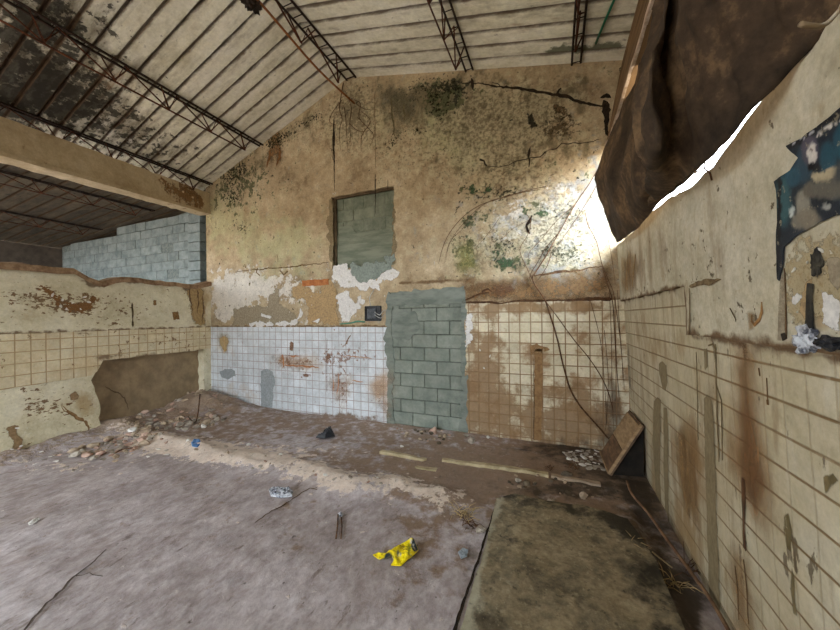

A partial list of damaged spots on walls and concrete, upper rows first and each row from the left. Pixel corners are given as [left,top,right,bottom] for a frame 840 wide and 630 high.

leakage [378,75,467,150]
crack [462,78,611,167]
leakage [222,158,255,205]
peeling [232,198,400,327]
peeling [778,233,840,340]
leakage [732,559,751,630]